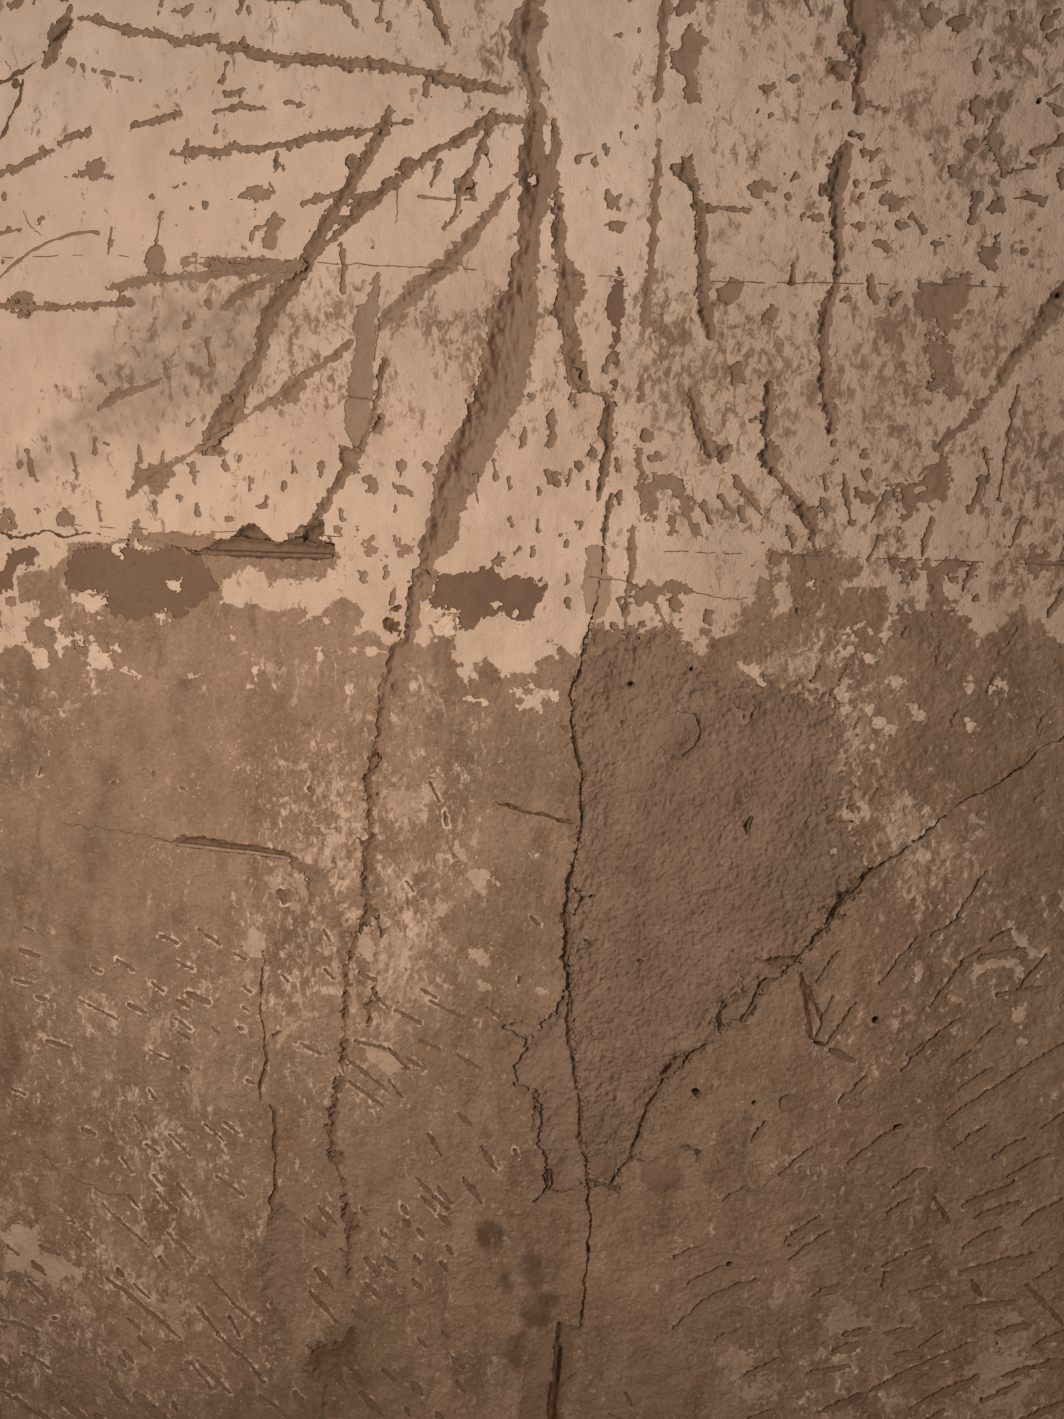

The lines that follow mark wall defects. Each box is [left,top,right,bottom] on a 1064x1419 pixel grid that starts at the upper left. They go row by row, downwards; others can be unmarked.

peeling [669,0,710,104]
peeling [143,151,286,276]
peeling [669,154,829,234]
crack [0,524,148,541]
peeling [126,394,298,551]
crack [186,531,357,555]
peeling [327,508,416,637]
peeling [537,428,763,537]
peeling [817,439,980,602]
spalling [502,520,886,1193]
crack [495,546,1064,1330]
crack [324,753,387,1279]